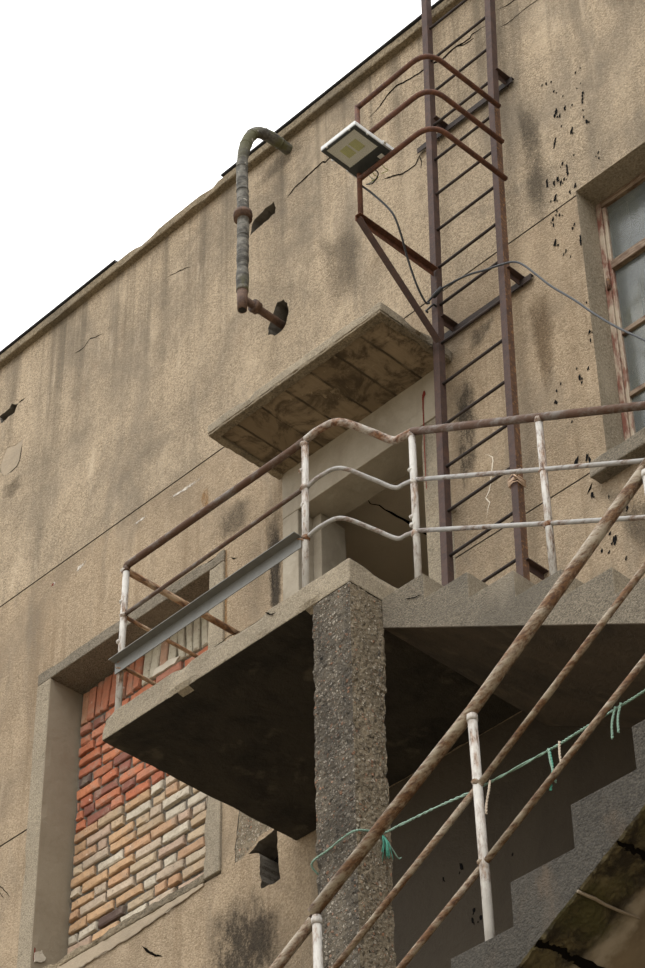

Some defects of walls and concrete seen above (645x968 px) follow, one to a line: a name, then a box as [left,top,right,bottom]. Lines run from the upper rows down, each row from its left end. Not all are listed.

crack [377,0,537,109]
spalling [541,67,589,134]
spalling [546,154,576,227]